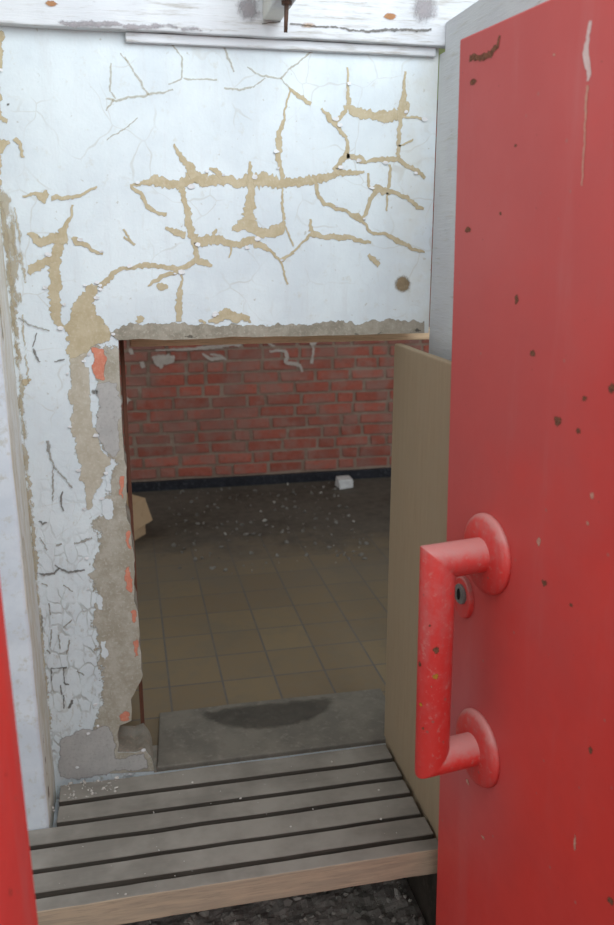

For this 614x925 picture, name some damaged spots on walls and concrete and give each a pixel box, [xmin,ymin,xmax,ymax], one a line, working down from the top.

peeling [22,186,97,204]
peeling [165,227,186,238]
water stain [129,344,241,369]
water stain [267,342,317,372]
peeling [0,137,52,729]
flaking render [57,280,424,776]
crack [38,441,92,708]